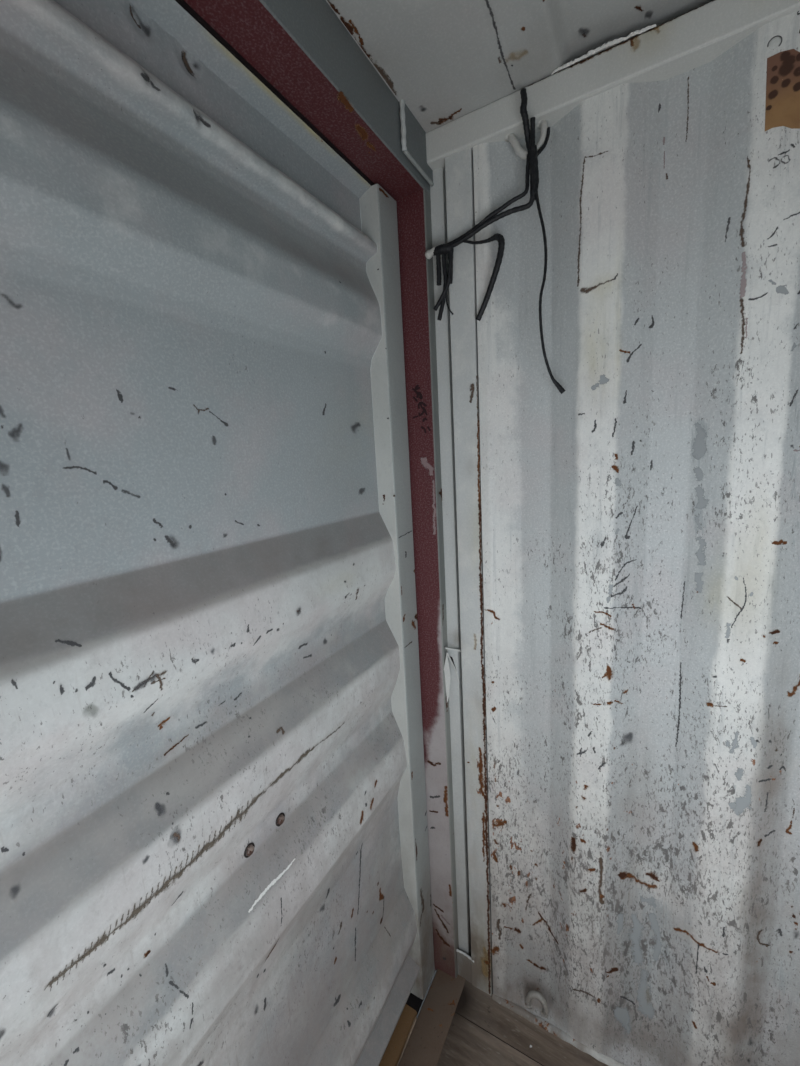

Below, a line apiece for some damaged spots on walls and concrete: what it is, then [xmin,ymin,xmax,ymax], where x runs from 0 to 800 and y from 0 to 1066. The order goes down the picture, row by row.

corrosion [327,0,396,95]
peeling [552,24,656,74]
corrosion [467,375,523,994]